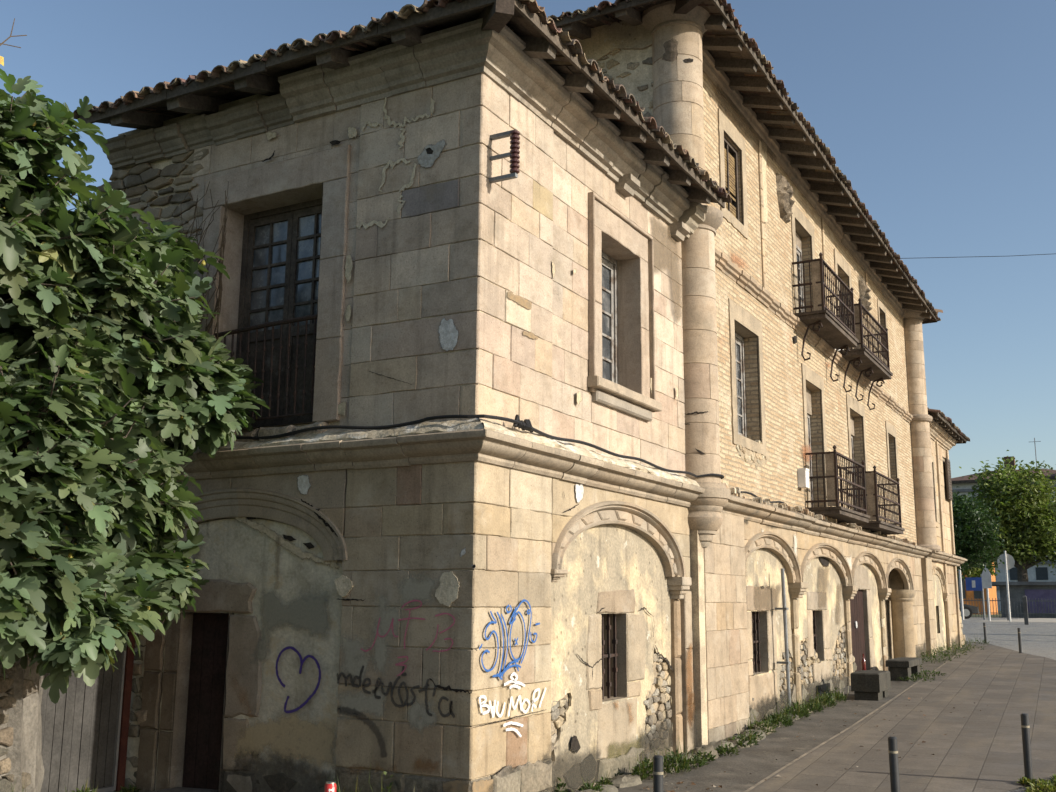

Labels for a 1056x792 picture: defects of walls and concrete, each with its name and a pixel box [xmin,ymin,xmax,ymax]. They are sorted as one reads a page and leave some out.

flaking render [779,638,820,701]
flaking render [833,626,856,680]
flaking render [550,698,568,752]
flaking render [643,653,672,748]
leakage [220,755,331,792]